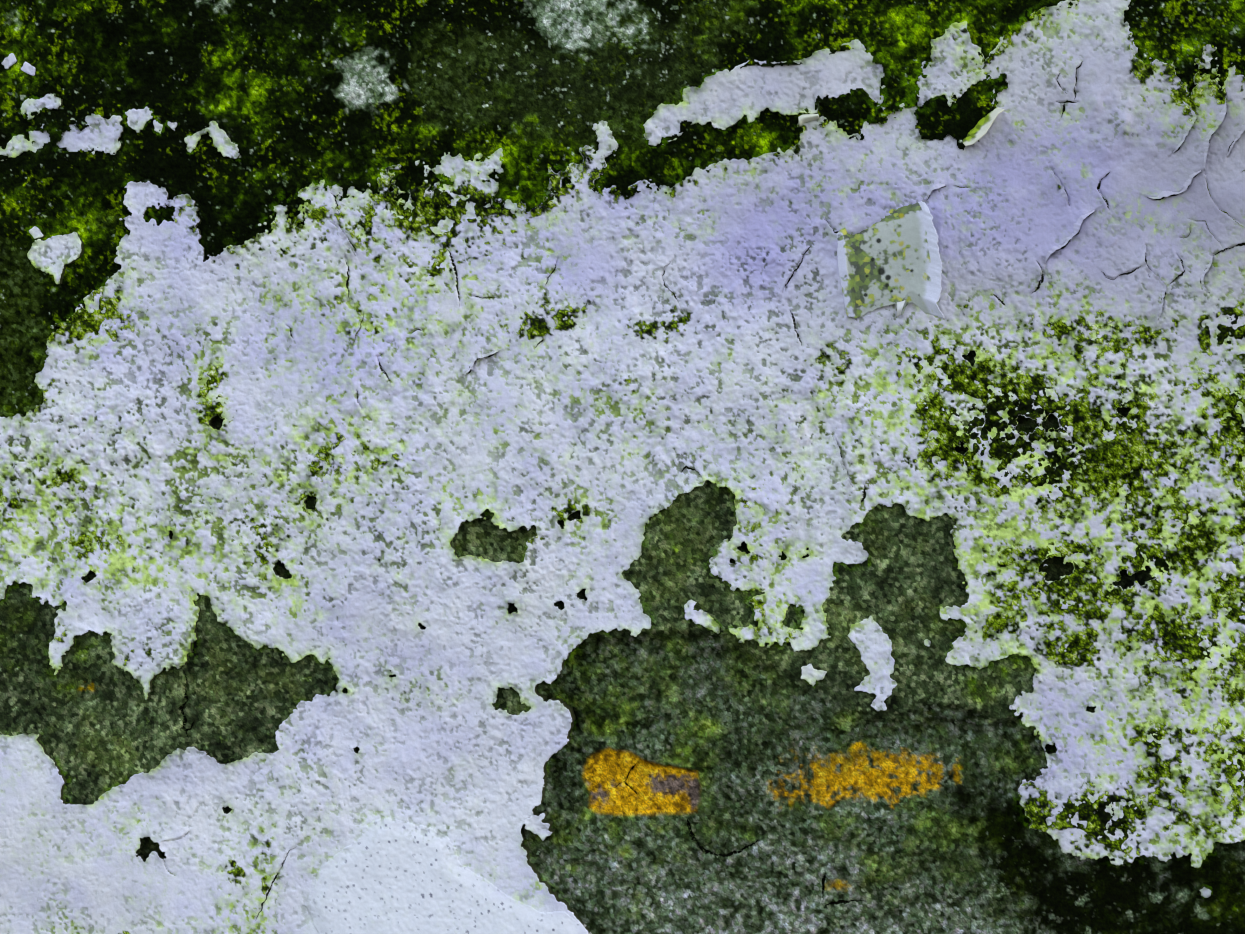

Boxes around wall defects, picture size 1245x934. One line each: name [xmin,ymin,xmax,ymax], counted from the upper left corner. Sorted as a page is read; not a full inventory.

crack [1056,61,1083,118]
peeling [0,0,1079,418]
crack [993,170,1110,305]
crack [1101,98,1245,318]
spalling [1015,414,1059,435]
peeling [452,509,537,563]
peeling [0,581,348,804]
peeling [493,687,531,715]
spalling [522,480,1056,934]